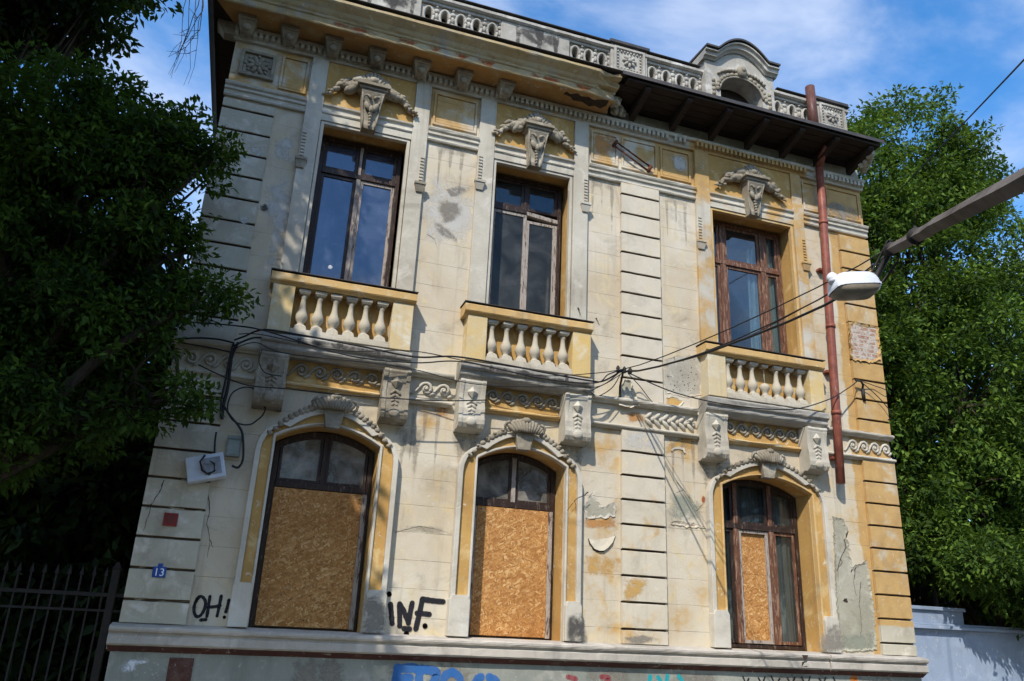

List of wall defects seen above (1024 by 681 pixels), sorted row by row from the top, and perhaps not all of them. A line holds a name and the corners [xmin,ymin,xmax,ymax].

damp [437,188,465,240]
spalling [847,321,881,363]
crack [205,495,213,557]
spalling [584,493,616,519]
peeling [832,516,877,652]